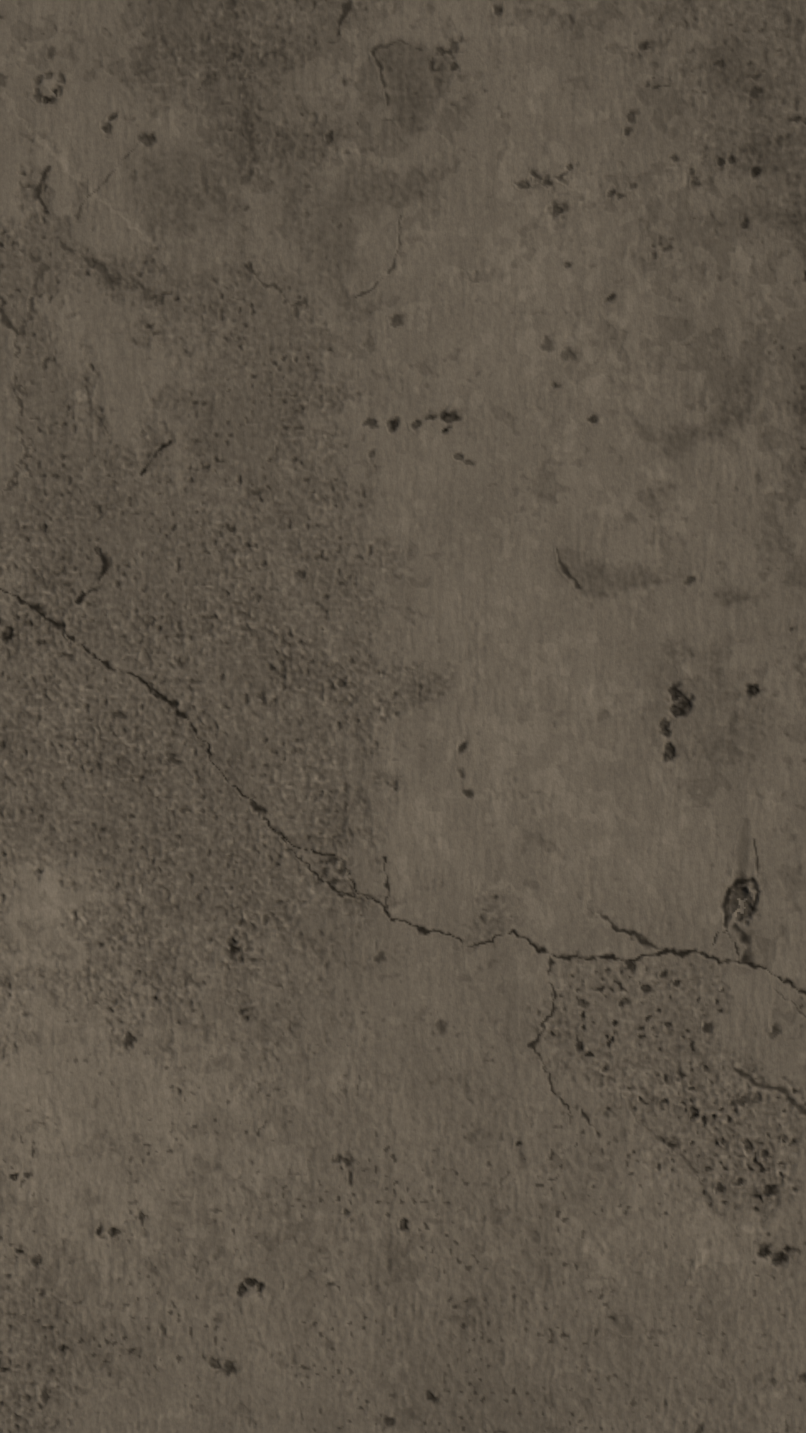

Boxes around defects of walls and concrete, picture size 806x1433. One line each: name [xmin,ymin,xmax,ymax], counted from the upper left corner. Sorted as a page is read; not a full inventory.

crack [0,542,806,1140]